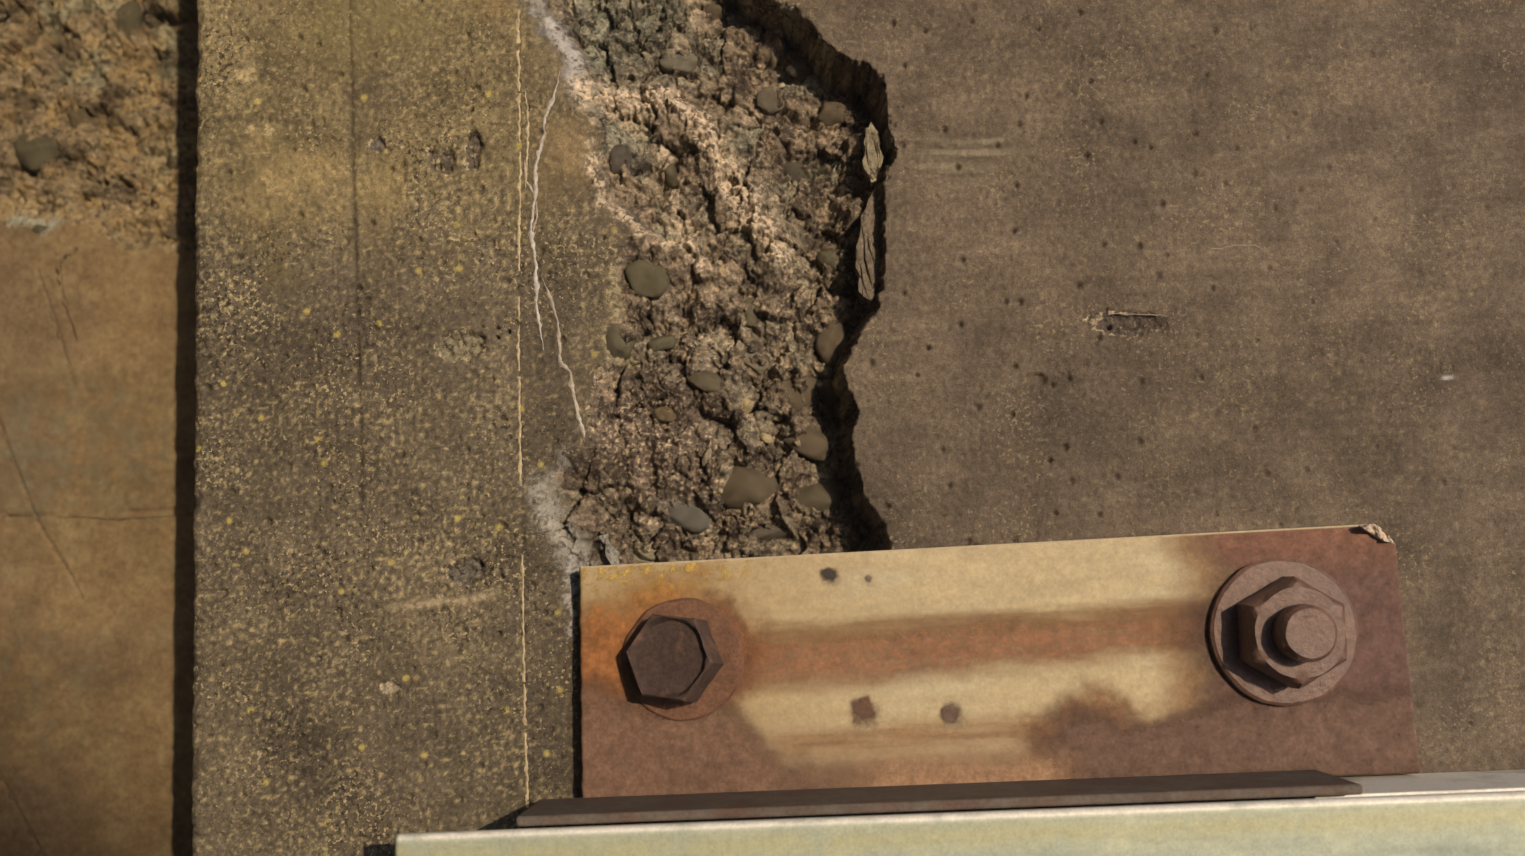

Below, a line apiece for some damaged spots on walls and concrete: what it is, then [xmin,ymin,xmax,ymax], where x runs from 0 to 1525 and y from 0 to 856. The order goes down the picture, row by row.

crack [516,10,585,486]
spalling [534,0,897,610]
crack [520,555,529,808]
corrosion [580,527,1420,798]